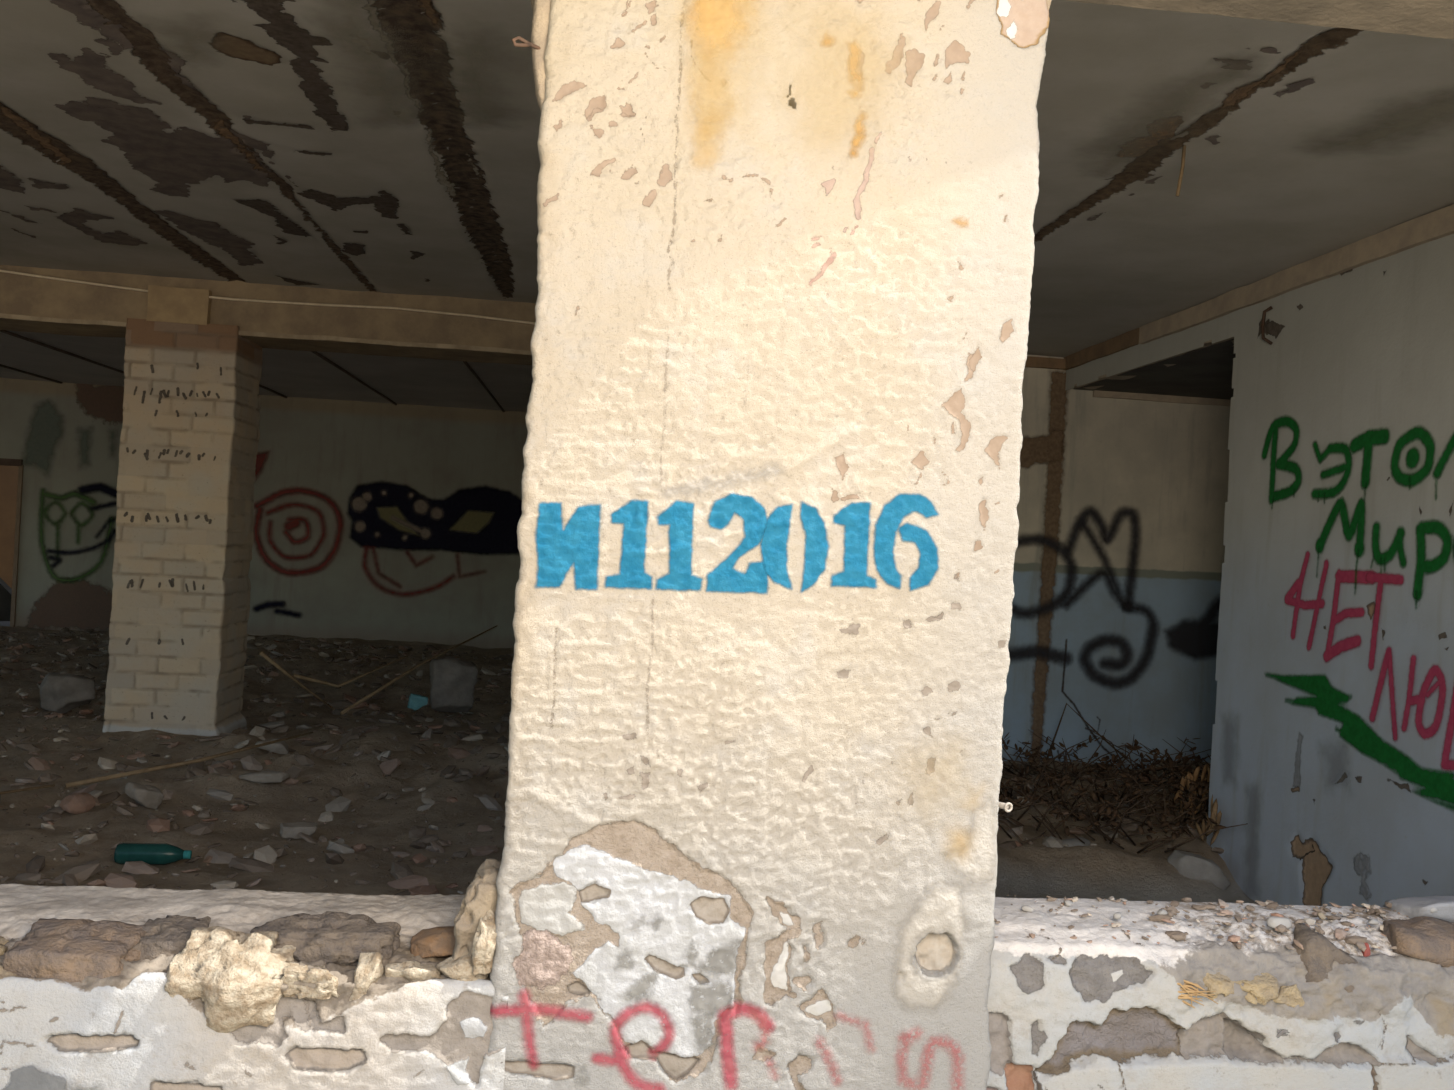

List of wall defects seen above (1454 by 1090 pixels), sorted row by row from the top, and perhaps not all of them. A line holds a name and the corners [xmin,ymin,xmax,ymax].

flaking render [552,0,666,139]
flaking render [885,0,971,94]
flaking render [996,0,1050,48]
peeling [48,0,424,266]
corrosion [850,114,864,156]
flaking render [1290,835,1333,906]
flaking render [509,820,837,1082]
flaking render [0,1011,139,1070]
flaking render [231,996,367,1072]
flaking render [380,991,575,1085]
flaking render [986,953,1381,1090]
crack [1371,1014,1454,1090]